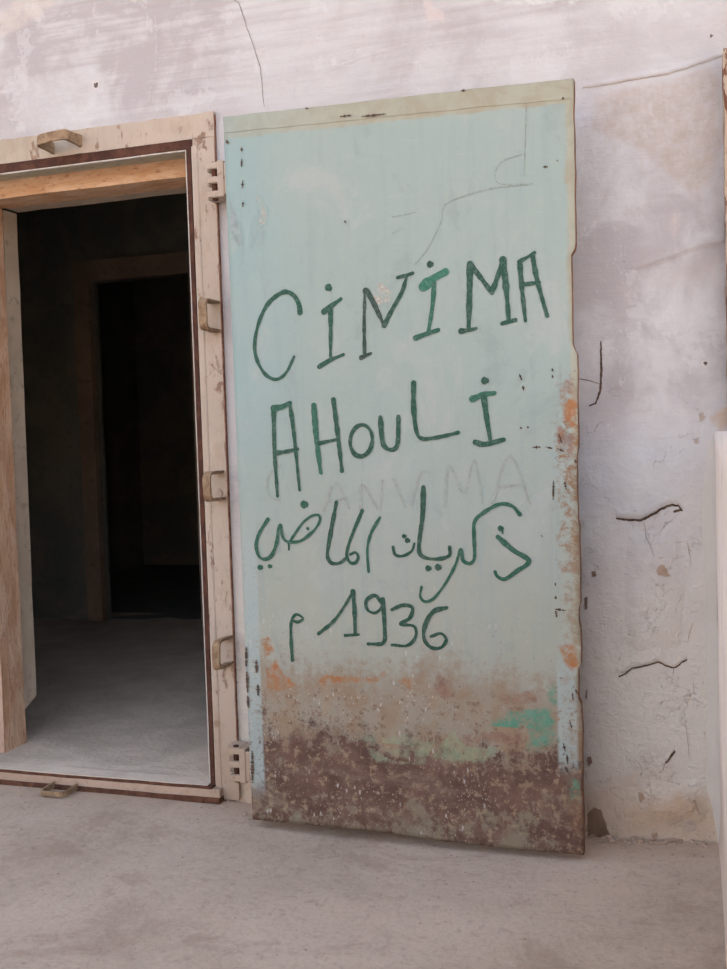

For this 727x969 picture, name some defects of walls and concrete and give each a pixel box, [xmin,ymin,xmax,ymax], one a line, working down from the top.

crack [235,0,265,107]
crack [616,487,691,566]
crack [619,623,694,690]
crack [662,721,689,771]